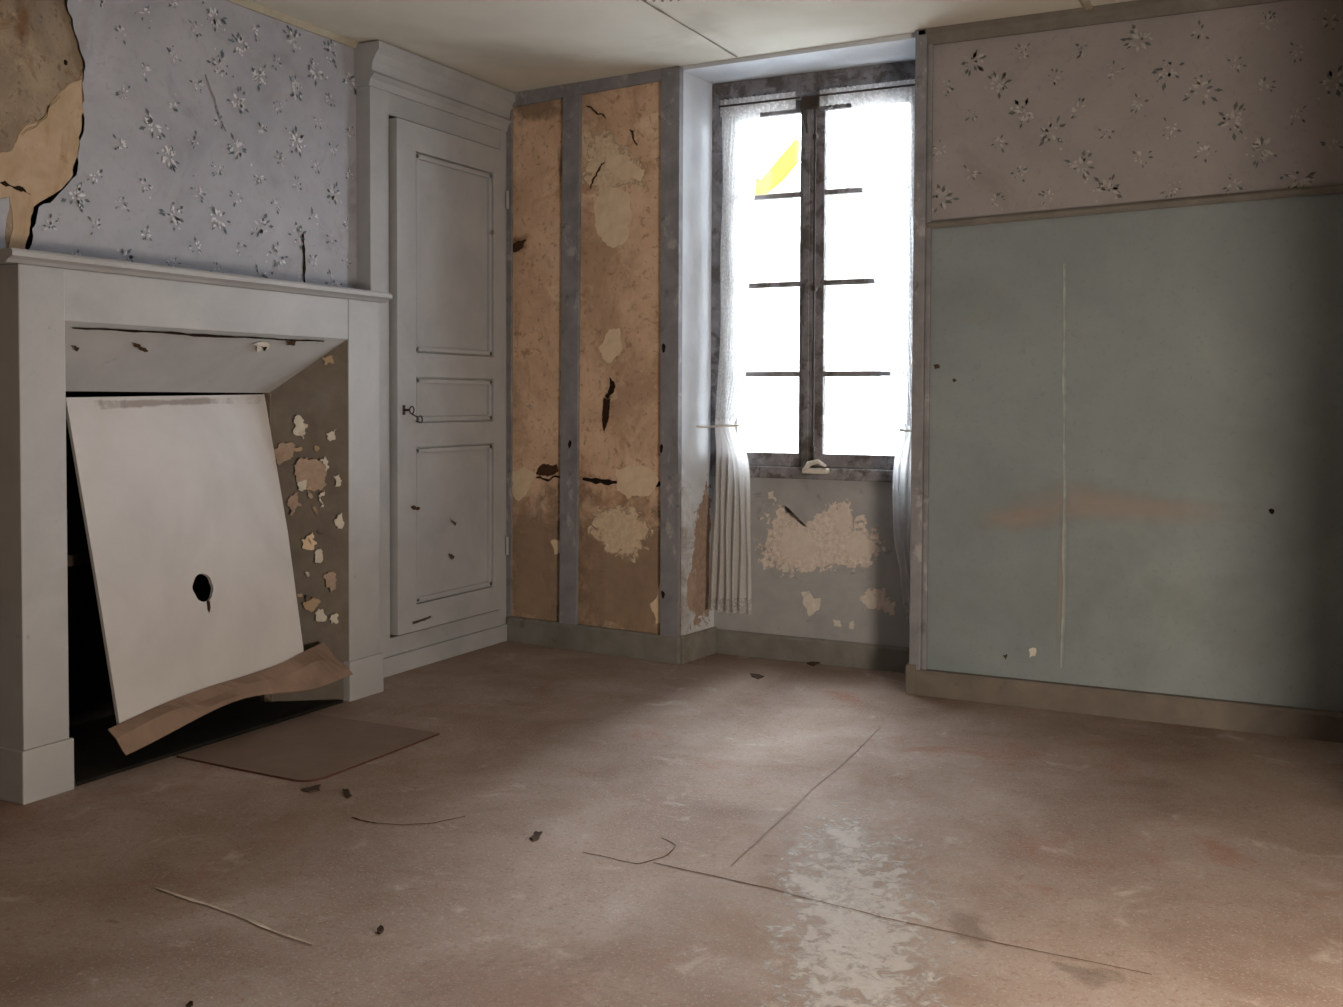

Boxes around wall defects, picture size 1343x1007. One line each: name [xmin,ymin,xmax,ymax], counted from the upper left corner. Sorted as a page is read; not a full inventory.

spalling [513,239,527,252]
peeling [582,129,647,248]
peeling [598,328,622,363]
peeling [274,415,344,624]
peeling [754,491,896,616]